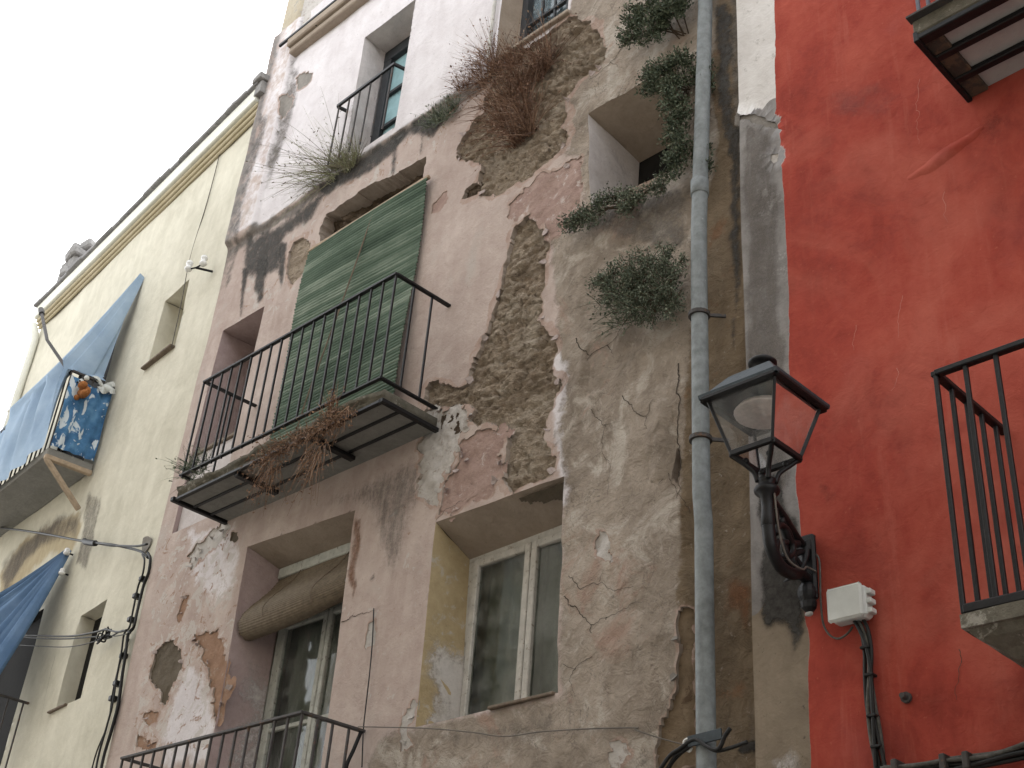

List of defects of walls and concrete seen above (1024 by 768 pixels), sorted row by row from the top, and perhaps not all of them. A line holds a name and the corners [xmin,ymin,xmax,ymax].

peeling [279,73,312,118]
leakage [234,113,443,309]
spalling [417,19,607,522]
leakage [715,4,784,366]
spalling [735,110,778,129]
crack [658,363,690,511]
leakage [761,459,803,645]
spalling [137,641,183,750]
peeling [192,631,237,727]
peeling [427,647,464,724]
crack [564,567,641,696]
peeling [657,608,696,768]